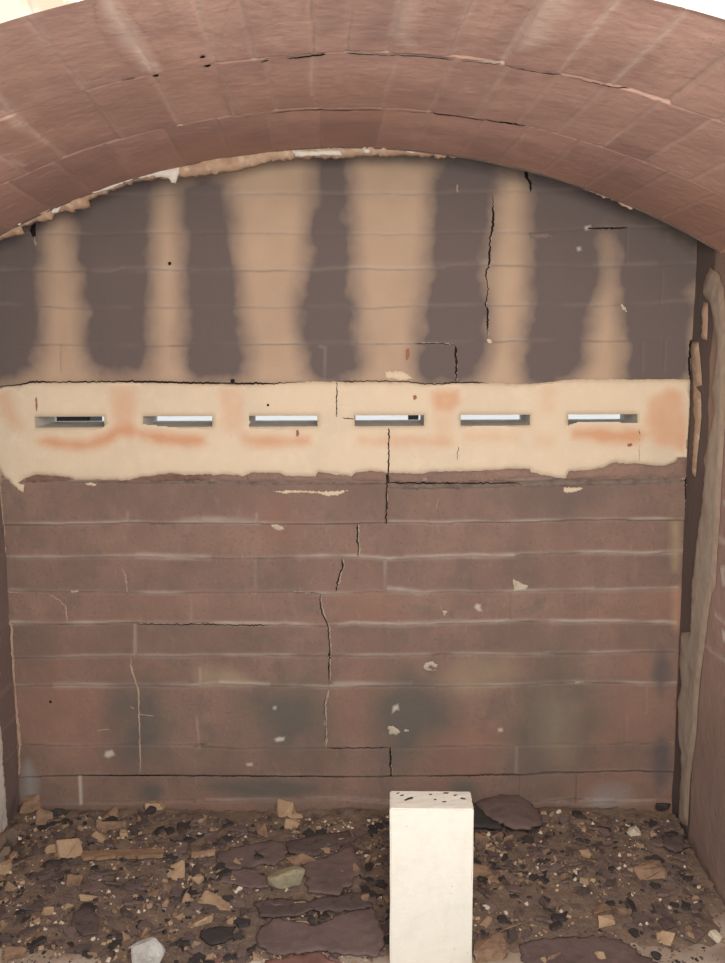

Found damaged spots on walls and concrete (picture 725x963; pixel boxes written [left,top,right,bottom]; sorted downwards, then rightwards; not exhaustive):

crack [261,51,627,88]
crack [406,111,549,132]
crack [485,195,495,338]
corrosion [0,384,318,457]
corrosion [352,385,525,452]
corrosion [535,383,562,419]
corrosion [566,382,689,457]
crack [383,429,391,523]
crack [293,524,361,747]